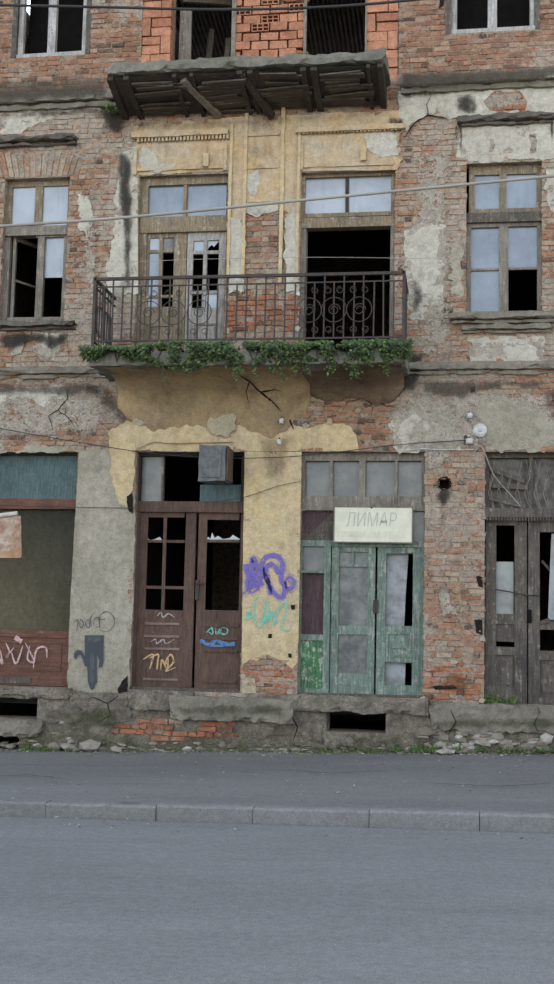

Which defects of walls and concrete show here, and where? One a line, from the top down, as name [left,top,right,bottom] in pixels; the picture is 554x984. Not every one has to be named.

flaking render [396,80,554,163]
leakage [119,155,132,286]
leakage [395,148,554,476]
crack [48,395,77,430]
crack [237,373,294,430]
spalling [301,401,360,429]
spalling [437,476,452,490]
leakage [436,582,467,624]
spalling [239,653,294,694]
spalling [420,660,485,703]
spalling [111,718,239,741]